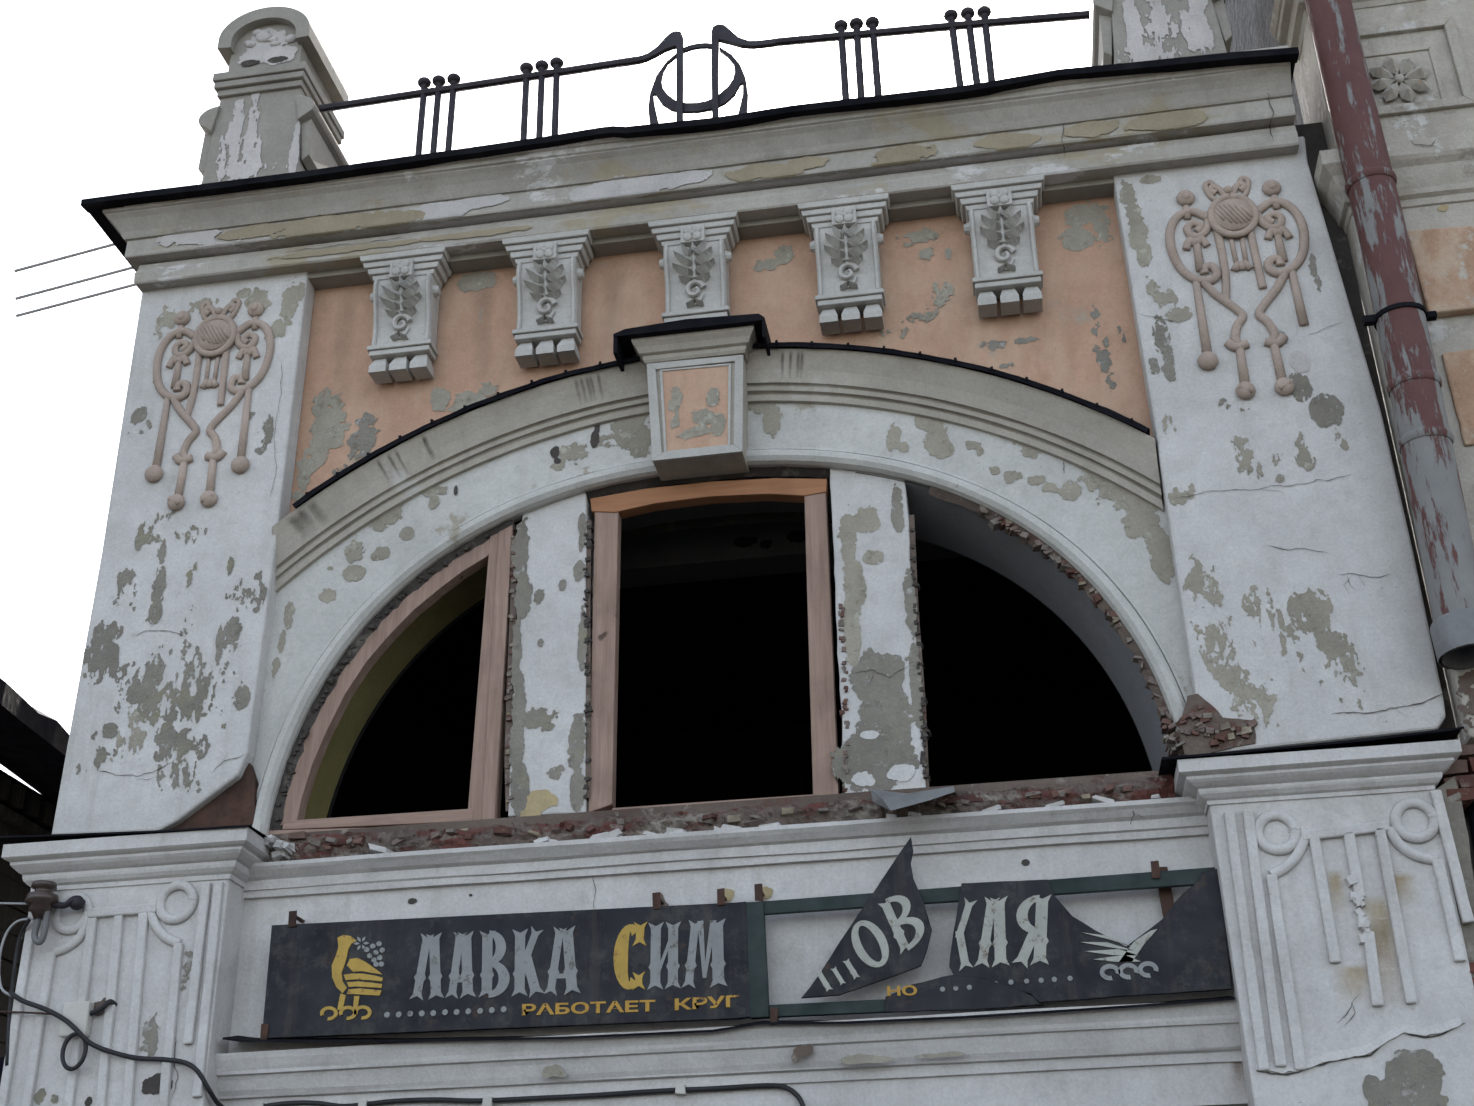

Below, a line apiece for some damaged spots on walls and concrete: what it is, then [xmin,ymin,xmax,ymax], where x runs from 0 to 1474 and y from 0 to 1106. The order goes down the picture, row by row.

peeling [1117,0,1215,63]
peeling [215,93,300,182]
peeling [1308,253,1322,291]
peeling [291,387,380,501]
peeling [550,415,651,471]
peeling [1230,331,1349,483]
spalling [886,416,1365,756]
peeling [76,510,267,798]
flaking render [264,466,1175,862]
spalling [1435,670,1474,985]
peeling [1255,1015,1465,1106]